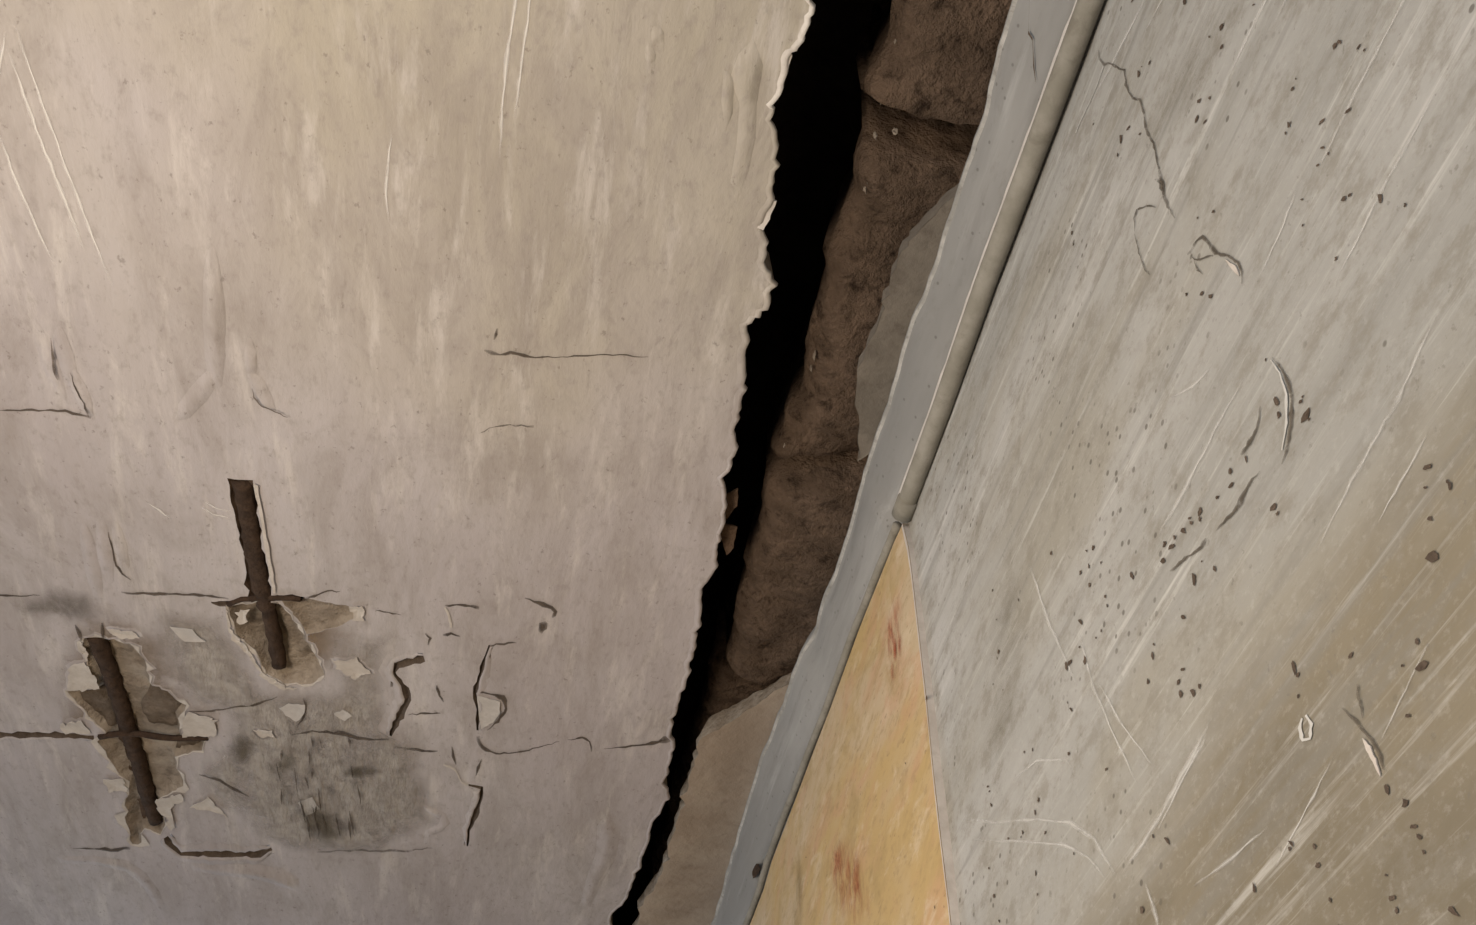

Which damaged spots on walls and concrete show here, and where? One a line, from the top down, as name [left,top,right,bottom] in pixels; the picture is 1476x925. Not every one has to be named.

crack [1076,60,1171,272]
crack [1192,234,1242,276]
crack [0,408,87,417]
crack [377,0,1036,925]
crack [0,591,32,599]
crack [308,590,336,598]
flaking render [60,478,421,848]
crack [0,731,94,744]
crack [76,834,274,866]
crack [338,846,422,854]